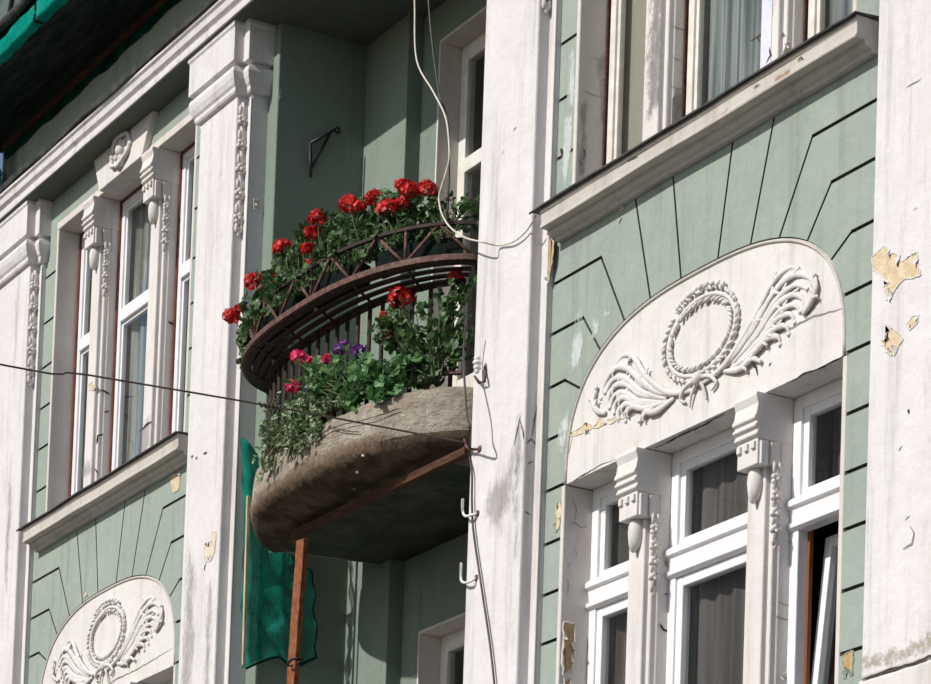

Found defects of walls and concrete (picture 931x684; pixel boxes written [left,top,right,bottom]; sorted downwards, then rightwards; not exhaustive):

flaking render [871,245,922,301]
flaking render [880,314,919,357]
flaking render [569,415,621,437]
flaking render [202,531,216,568]
flaking render [561,621,579,684]